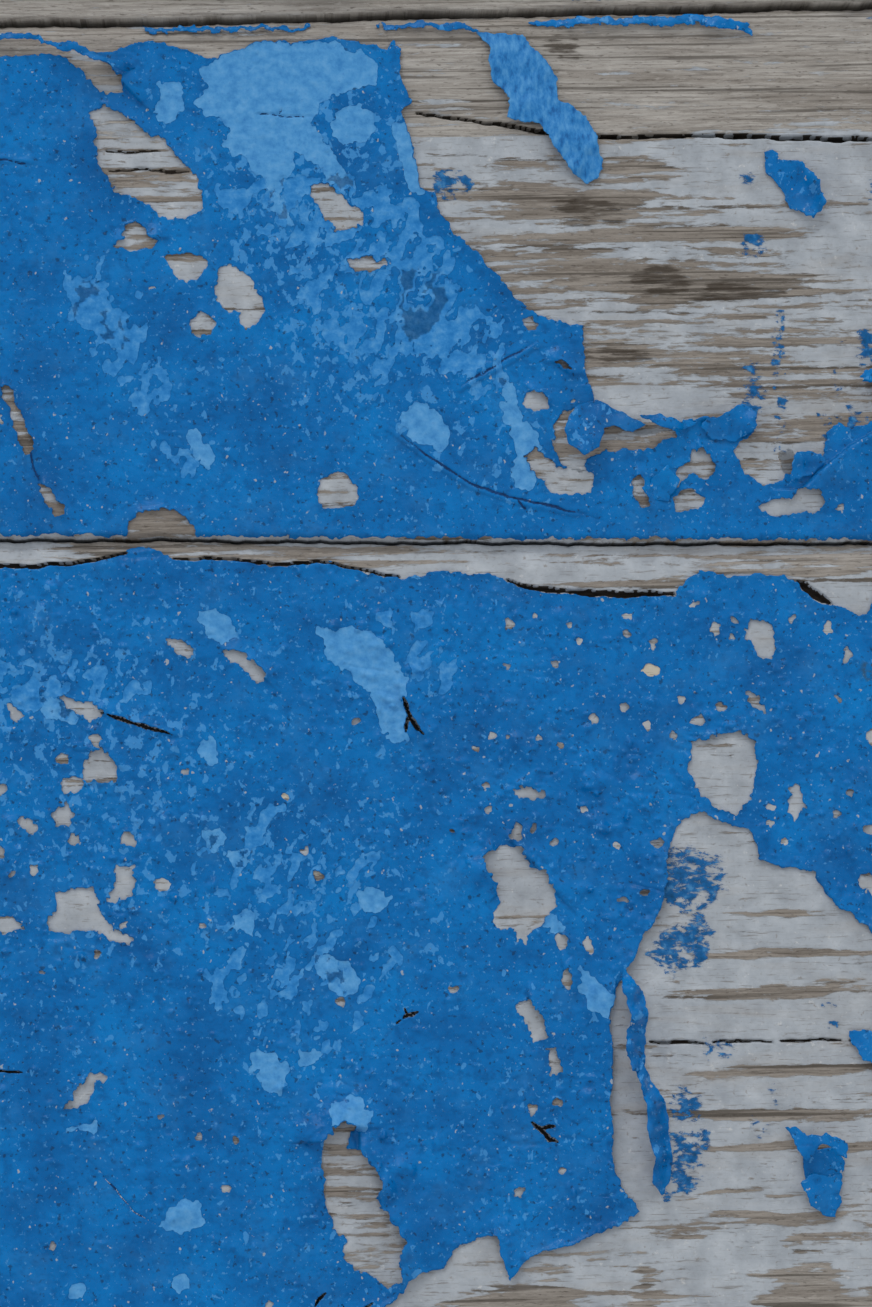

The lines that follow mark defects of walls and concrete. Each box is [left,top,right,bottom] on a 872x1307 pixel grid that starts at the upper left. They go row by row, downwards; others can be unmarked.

peeling [0,14,872,517]
crack [30,452,39,480]
crack [401,435,575,512]
peeling [197,735,218,766]
peeling [0,846,38,877]
peeling [153,878,171,892]
peeling [47,864,136,959]
peeling [191,793,403,1096]
peeling [321,702,872,1307]
peeling [64,1072,108,1109]
peeling [159,1198,205,1235]
peeling [68,1283,86,1299]